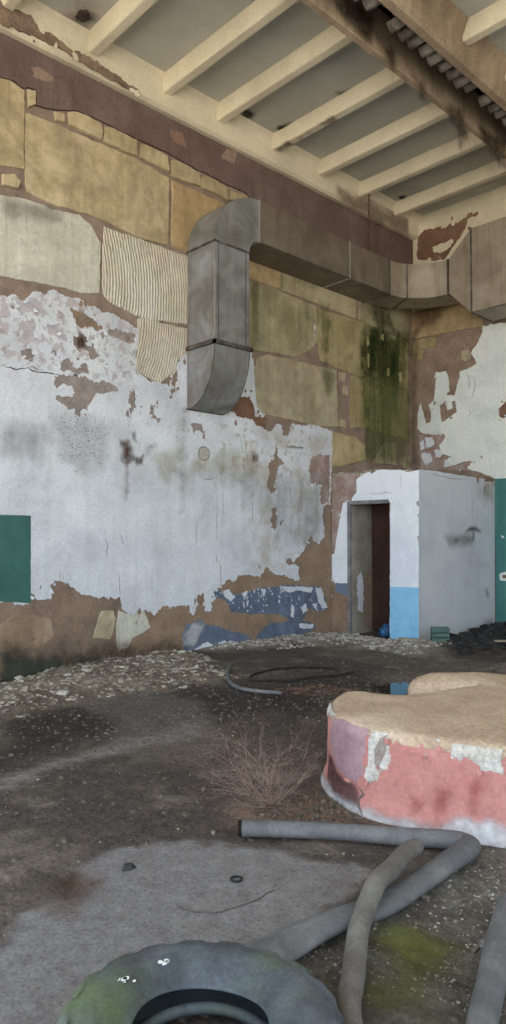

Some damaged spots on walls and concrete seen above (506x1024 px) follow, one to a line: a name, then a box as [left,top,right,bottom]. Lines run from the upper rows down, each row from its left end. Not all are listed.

peeling [0,1,140,97]
damp [338,4,372,41]
damp [449,108,467,146]
peeling [415,209,479,263]
peeling [9,297,186,423]
damp [362,305,396,375]
flaking render [230,389,273,429]
flaking render [387,324,495,488]
peeling [267,441,284,494]
flaking render [0,452,366,678]
peeling [327,693,398,786]
peeling [421,739,506,776]